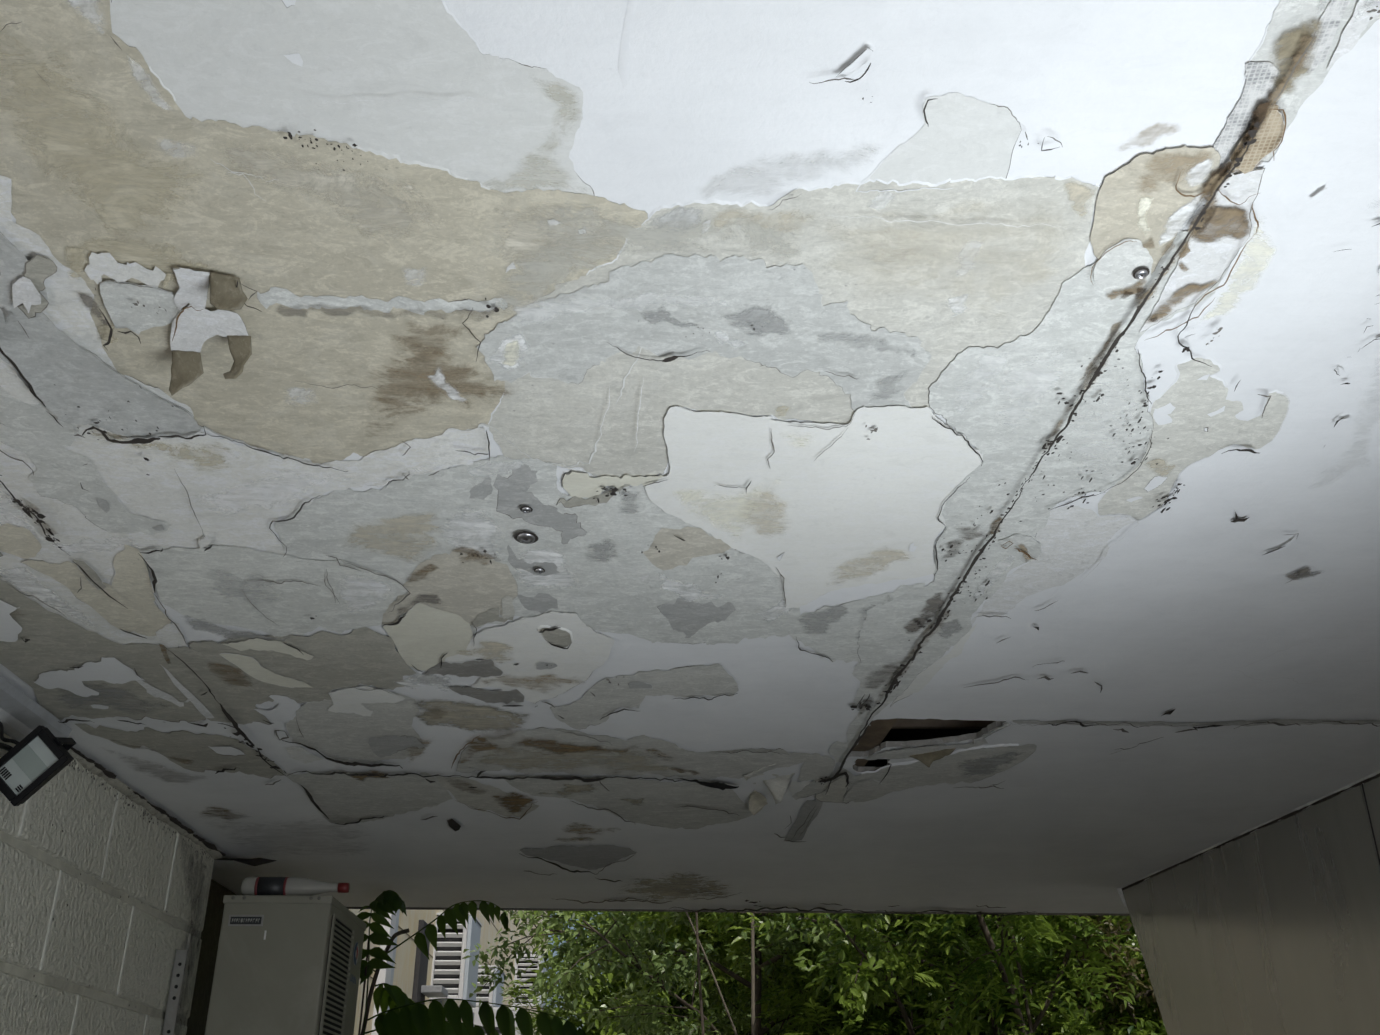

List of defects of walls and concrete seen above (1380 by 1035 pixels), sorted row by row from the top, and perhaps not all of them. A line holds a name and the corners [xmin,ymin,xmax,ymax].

water stain [1090,22,1320,340]
peeling [1213,0,1380,164]
peeling [0,0,1290,831]
crack [818,31,1317,795]
crack [60,648,740,856]
peeling [519,844,637,882]
crack [969,661,1380,754]
crack [1122,773,1380,891]